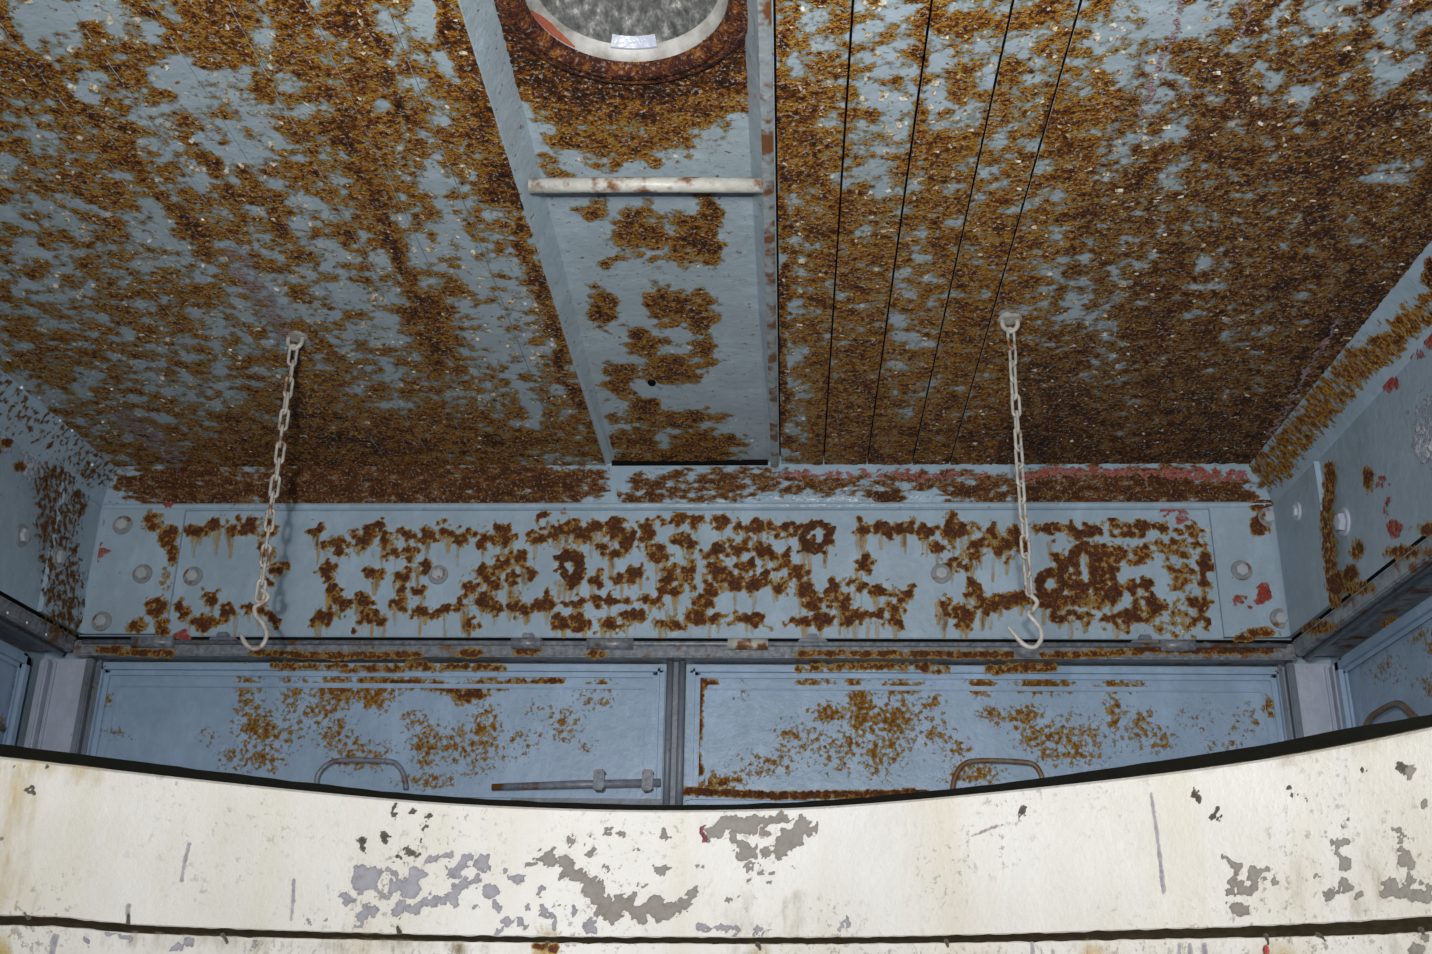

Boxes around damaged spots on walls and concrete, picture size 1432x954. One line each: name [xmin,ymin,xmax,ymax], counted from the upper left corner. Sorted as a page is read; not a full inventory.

corrosion [0,0,1432,642]
corrosion [95,645,175,659]
corrosion [304,510,1281,801]
corrosion [218,647,566,792]
peeling [1395,761,1417,780]
peeling [338,802,772,937]
peeling [699,810,818,904]
peeling [1221,853,1279,917]
peeling [1313,817,1432,904]